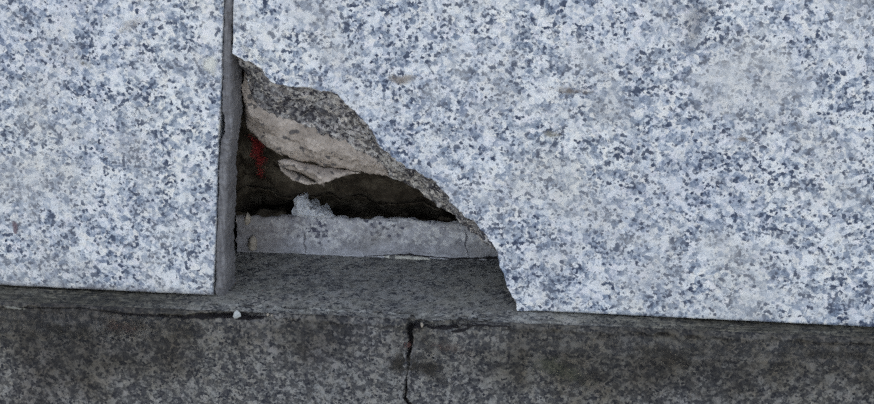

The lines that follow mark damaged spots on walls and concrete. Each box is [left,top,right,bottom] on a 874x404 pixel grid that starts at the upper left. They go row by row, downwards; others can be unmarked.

spalling [235,55,498,253]
crack [2,307,267,320]
crack [403,323,510,404]